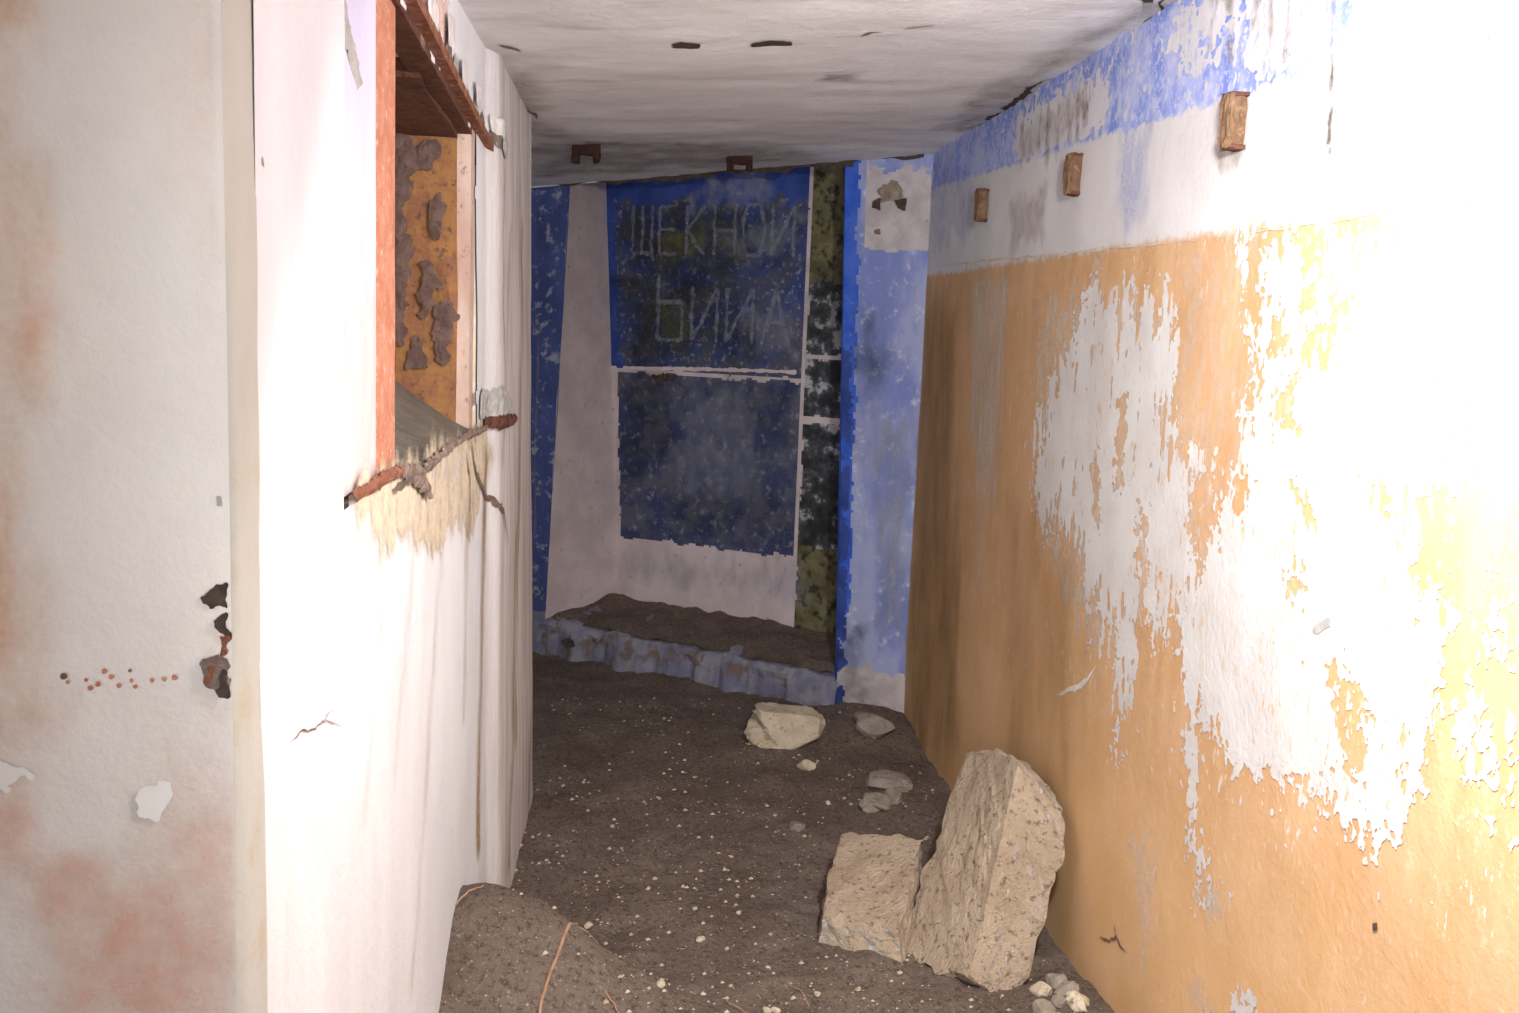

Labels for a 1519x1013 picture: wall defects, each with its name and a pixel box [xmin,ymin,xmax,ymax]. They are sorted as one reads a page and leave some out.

peeling [1002,0,1332,162]
spalling [872,180,907,211]
spalling [353,385,513,558]
peeling [1029,179,1519,918]
spalling [199,583,232,699]
crack [293,711,341,740]
peeling [1230,983,1258,1013]